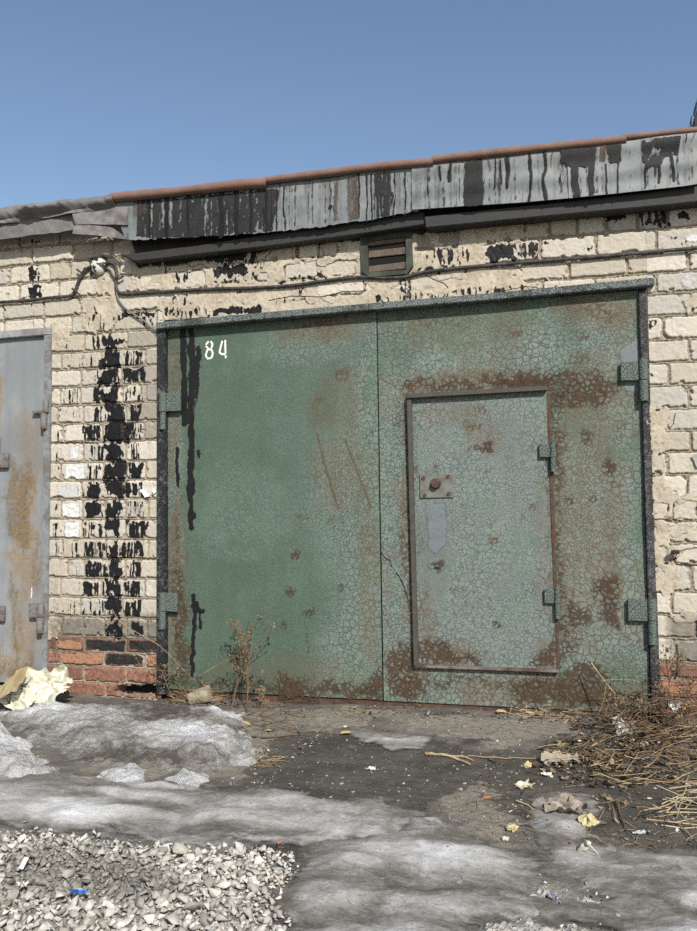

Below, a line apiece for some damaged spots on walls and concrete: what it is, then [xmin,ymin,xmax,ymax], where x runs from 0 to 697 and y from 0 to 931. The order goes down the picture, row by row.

spalling [368,237,406,271]
rust [402,354,619,514]
rust [172,569,615,710]
crack [380,549,408,600]
rust [529,532,620,667]